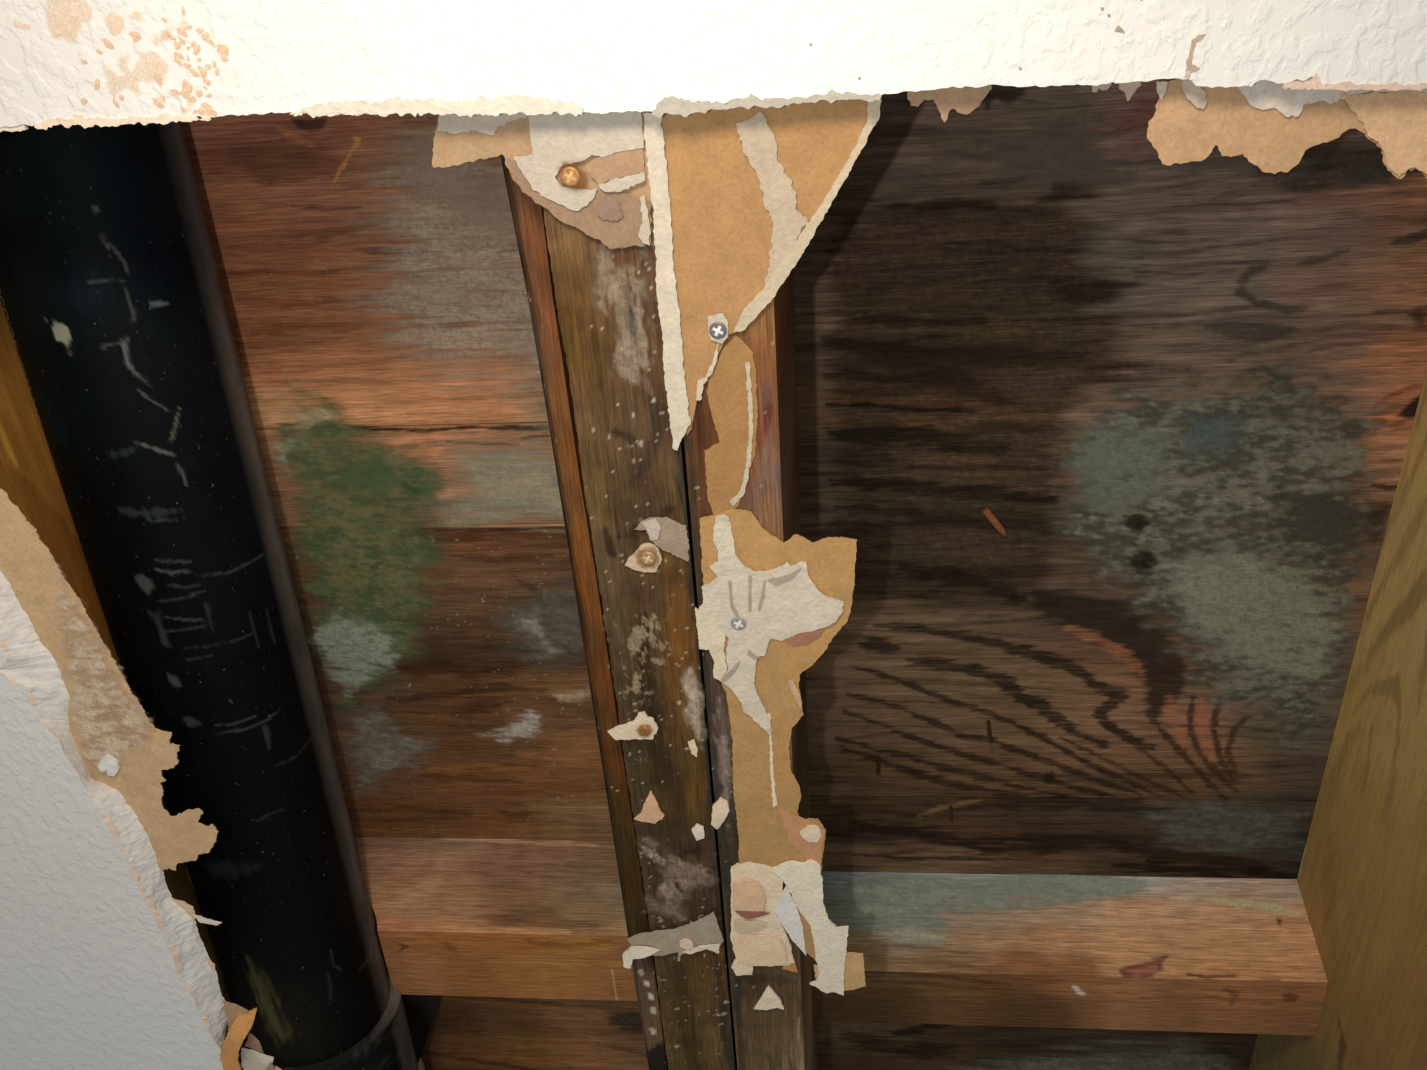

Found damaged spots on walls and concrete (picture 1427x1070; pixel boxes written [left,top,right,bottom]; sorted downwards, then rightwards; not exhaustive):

peeling [47,0,229,117]
leakage [354,132,542,387]
leakage [275,383,563,786]
leakage [499,589,584,667]
leakage [1052,364,1388,748]
leakage [554,691,591,701]
mould [848,874,1140,942]